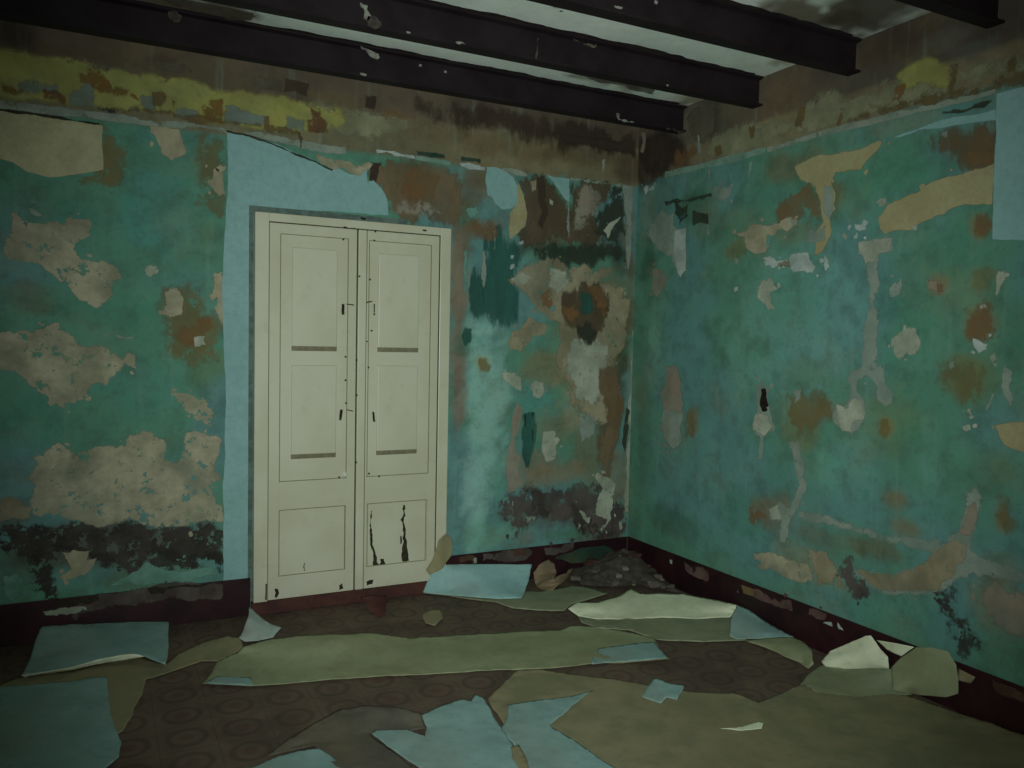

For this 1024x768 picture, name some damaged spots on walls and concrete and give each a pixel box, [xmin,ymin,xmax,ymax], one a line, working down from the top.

peeling [150,108,199,161]
peeling [4,200,121,308]
peeling [732,141,994,310]
peeling [0,322,137,413]
peeling [0,388,224,537]
leakage [0,521,224,600]
corrosion [163,285,220,364]
leakage [500,367,626,540]
spalling [508,256,630,442]
spalling [576,470,622,534]
spalling [752,375,775,459]
leakage [769,441,1024,656]